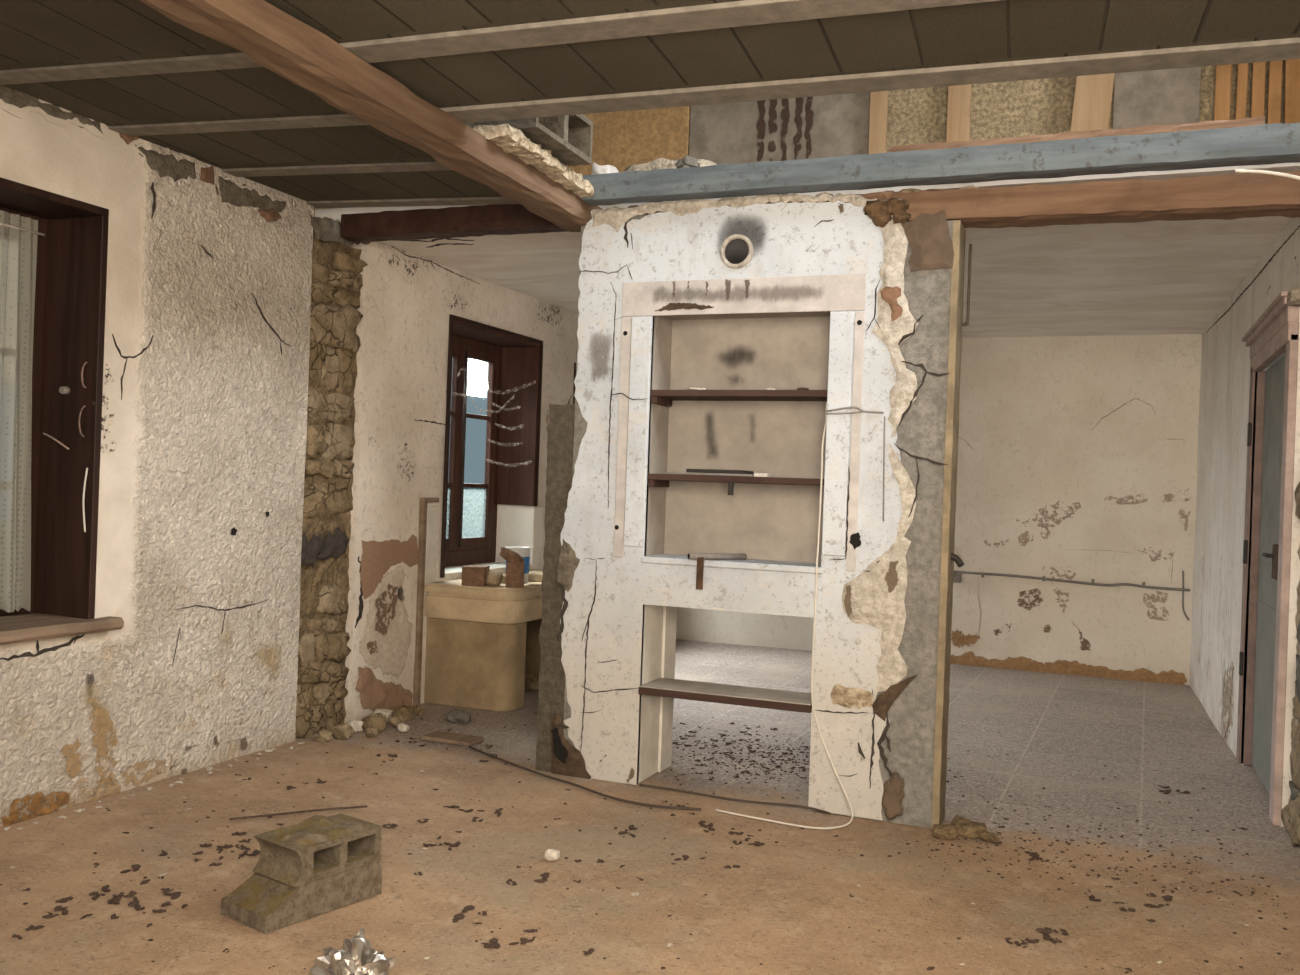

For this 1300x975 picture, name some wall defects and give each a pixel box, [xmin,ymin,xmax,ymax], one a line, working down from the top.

flaking render [0,85,291,222]
damp [756,96,814,161]
crack [251,293,292,355]
crack [112,334,153,400]
crack [865,280,973,518]
flaking render [295,213,418,738]
flaking render [830,215,919,721]
peeling [984,501,1081,547]
peeling [1017,566,1075,611]
crack [0,634,85,661]
crack [172,599,269,666]
peeling [881,771,905,821]